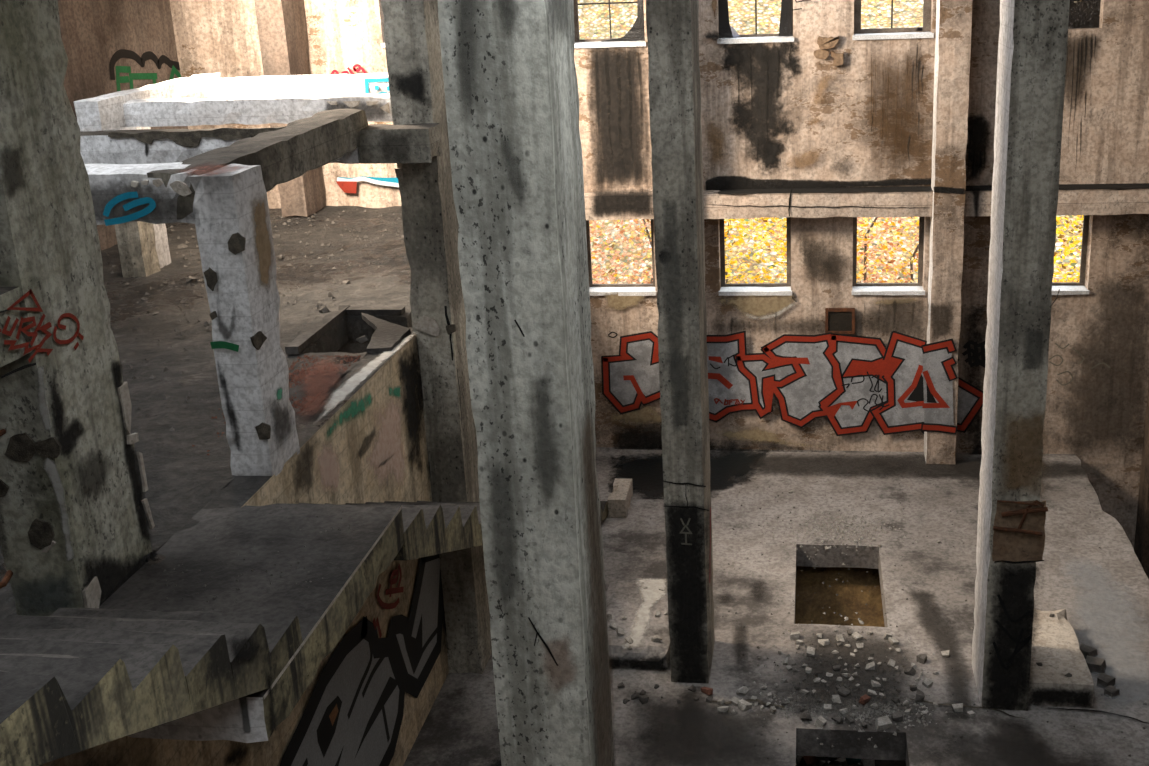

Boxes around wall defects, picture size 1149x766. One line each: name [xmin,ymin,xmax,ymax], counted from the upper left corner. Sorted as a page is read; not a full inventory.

damp [790,151,818,167]
damp [1065,36,1096,163]
damp [606,293,643,310]
damp [612,204,688,426]
damp [583,416,666,766]